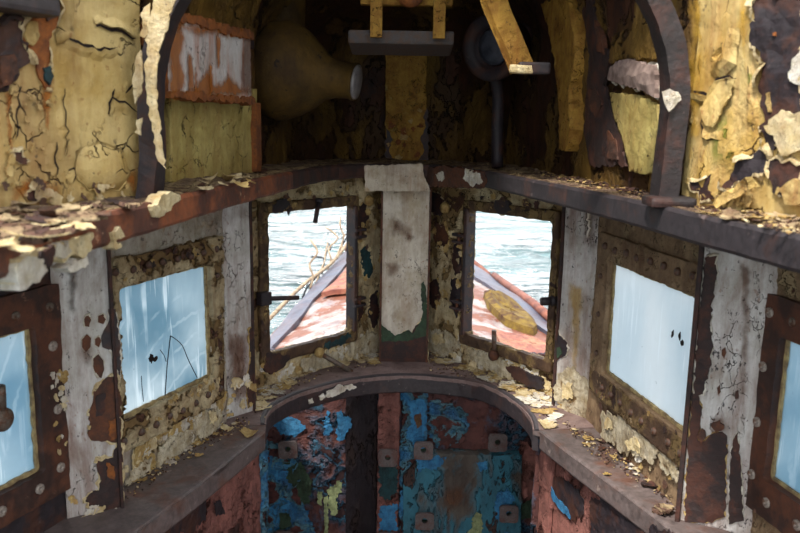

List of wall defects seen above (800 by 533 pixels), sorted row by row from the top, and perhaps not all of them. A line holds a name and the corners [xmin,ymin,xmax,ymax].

crack [3,82,26,139]
crack [45,87,76,183]
peeling [0,0,142,252]
crack [63,15,136,62]
crack [108,85,137,119]
corrosion [170,23,251,98]
spalling [684,0,800,229]
spalling [261,190,316,220]
spalling [324,191,672,490]
spalling [68,309,319,517]
peeling [266,409,352,533]
peeling [378,466,403,532]